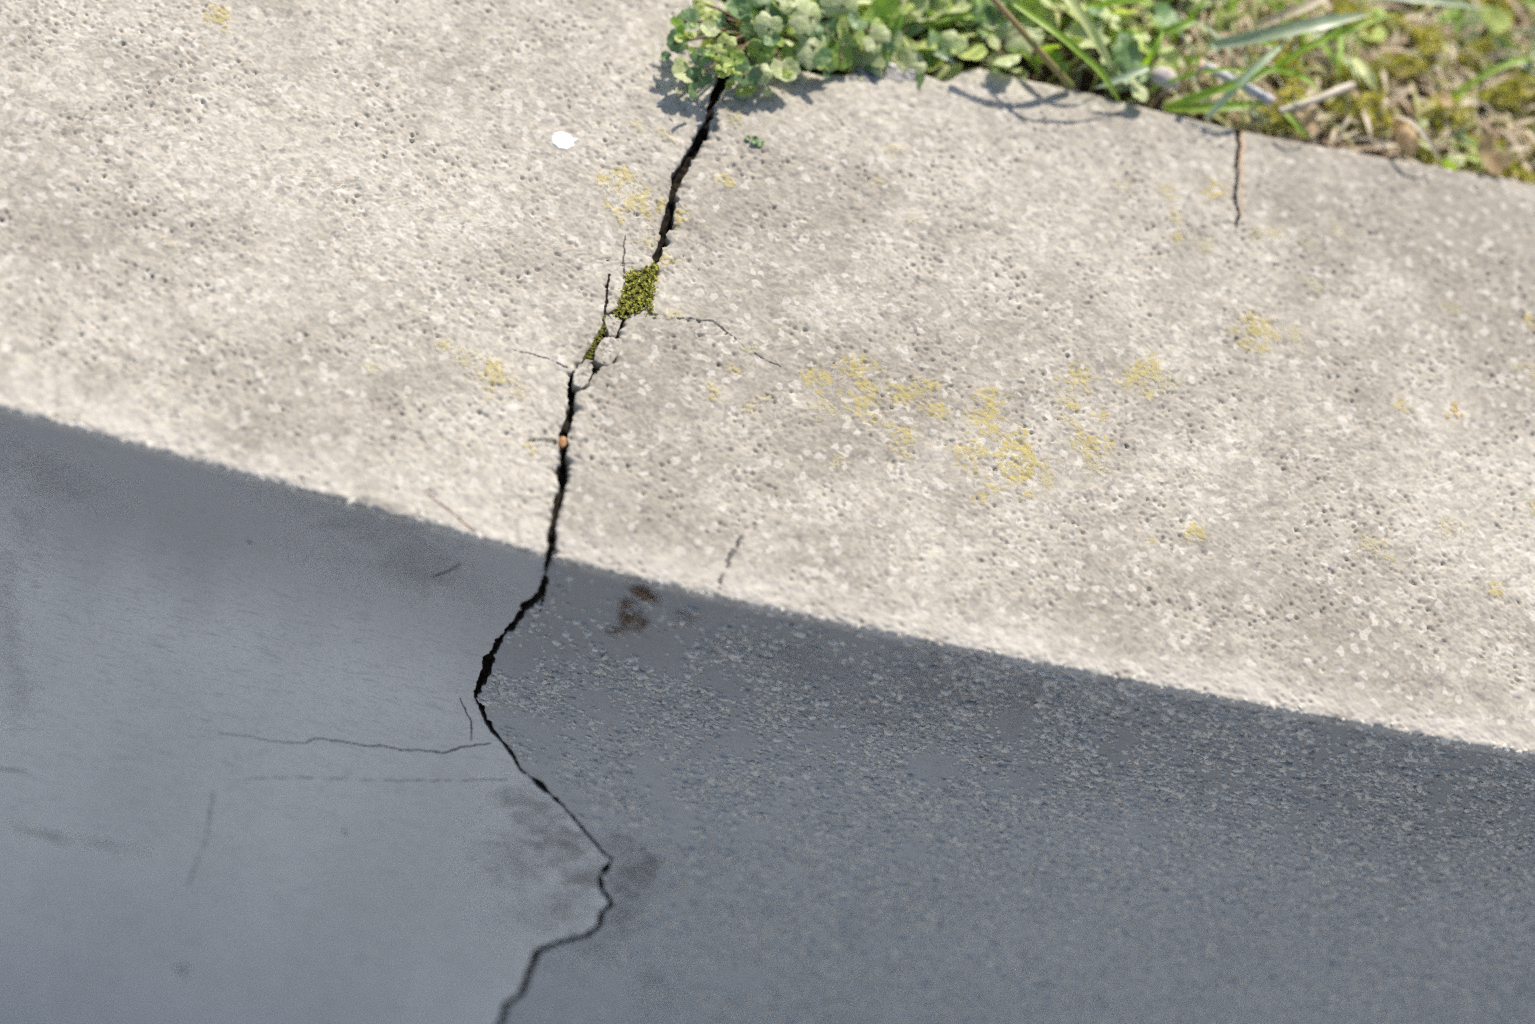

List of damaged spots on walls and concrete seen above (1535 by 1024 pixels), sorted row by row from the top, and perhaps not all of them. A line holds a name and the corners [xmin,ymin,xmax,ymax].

crack [1233,130,1245,227]
crack [219,76,781,782]
crack [598,859,611,920]
crack [499,947,541,1020]